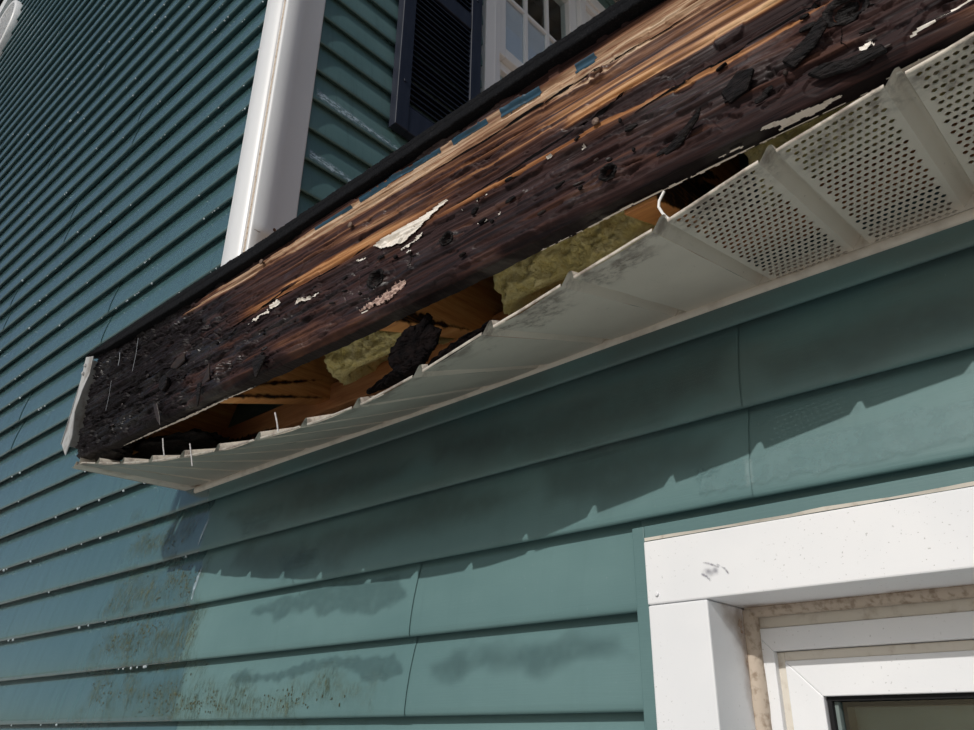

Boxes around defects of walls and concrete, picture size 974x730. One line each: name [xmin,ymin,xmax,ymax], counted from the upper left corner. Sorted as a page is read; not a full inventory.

peeling [859,27,892,51]
peeling [910,0,971,38]
peeling [541,95,846,251]
peeling [356,199,448,261]
peeling [342,276,406,313]
peeling [252,300,280,355]
peeling [127,388,252,444]